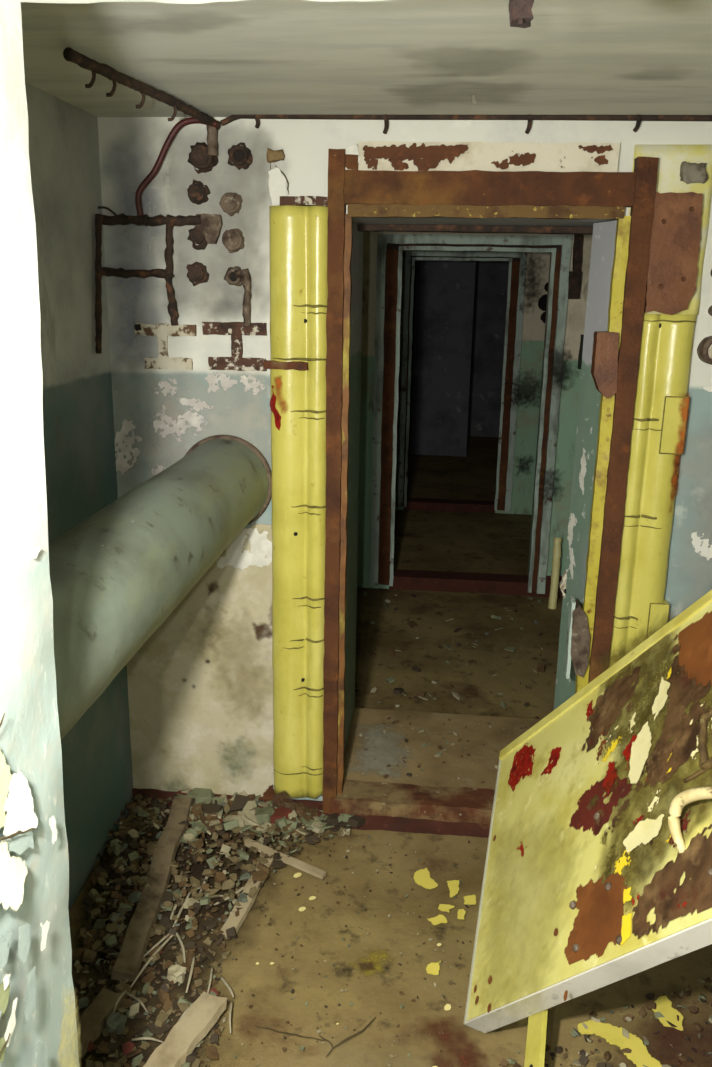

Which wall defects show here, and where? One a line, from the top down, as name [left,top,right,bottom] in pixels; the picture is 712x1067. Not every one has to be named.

rust [345,144,360,170]
peeling [153,372,265,442]
peeling [114,419,143,475]
peeling [691,532,712,561]
flaking render [127,524,296,810]
peeling [0,749,57,911]
peeling [0,920,50,1062]